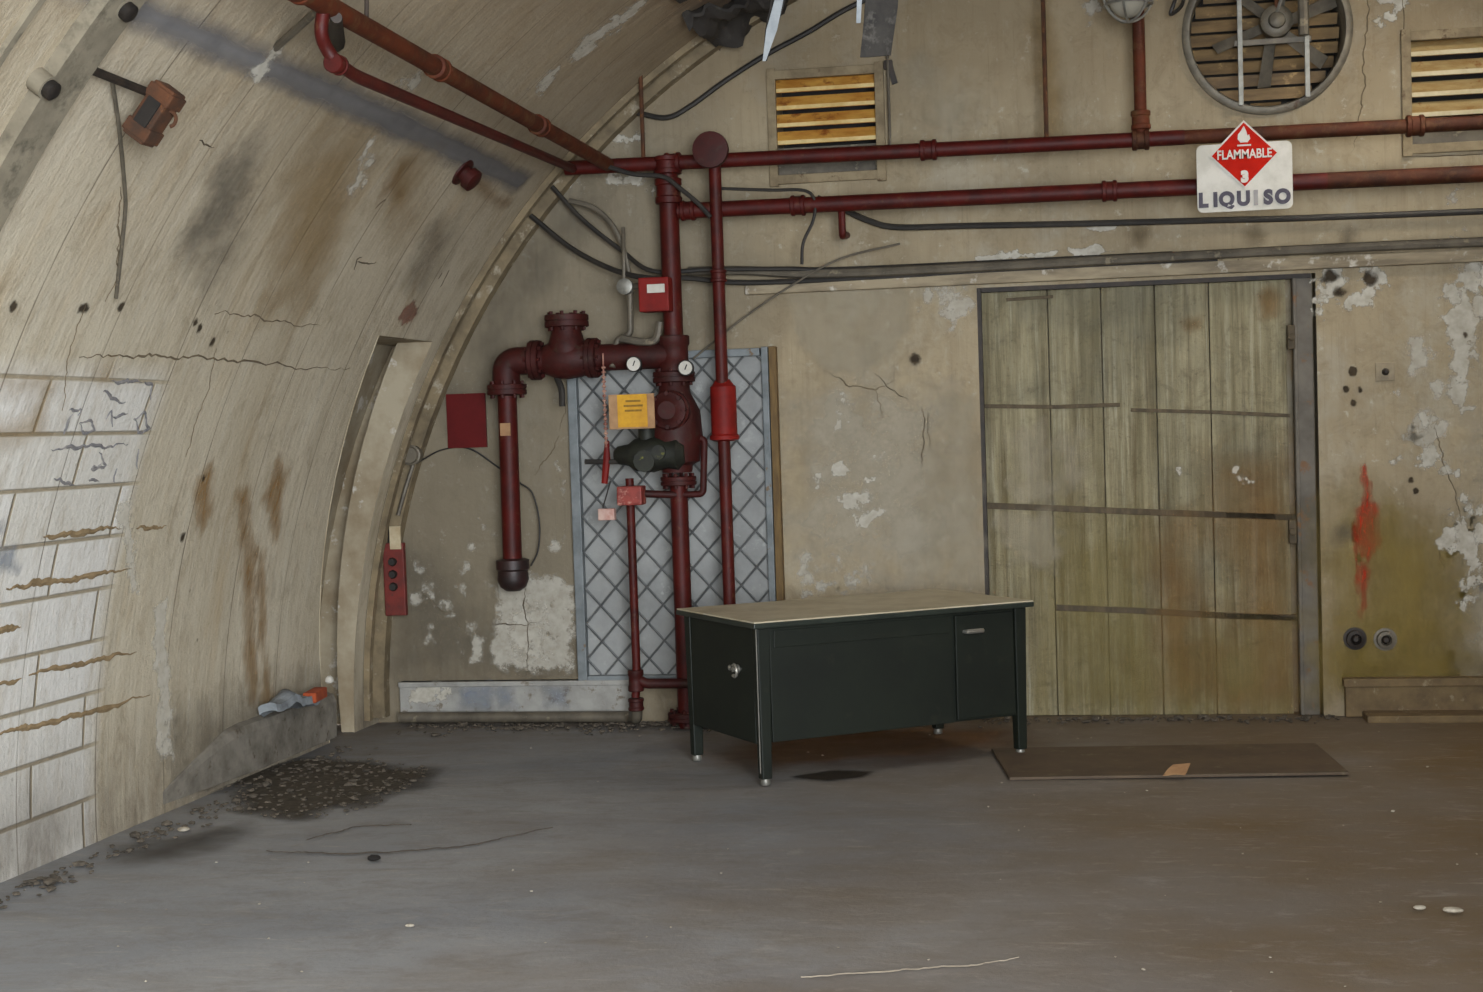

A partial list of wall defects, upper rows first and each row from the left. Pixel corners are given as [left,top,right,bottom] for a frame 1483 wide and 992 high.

corrosion [197,469,211,526]
crack [62,187,349,455]
corrosion [241,492,269,704]
corrosion [268,468,282,533]
spalling [1343,366,1362,406]
peeling [1390,262,1483,612]